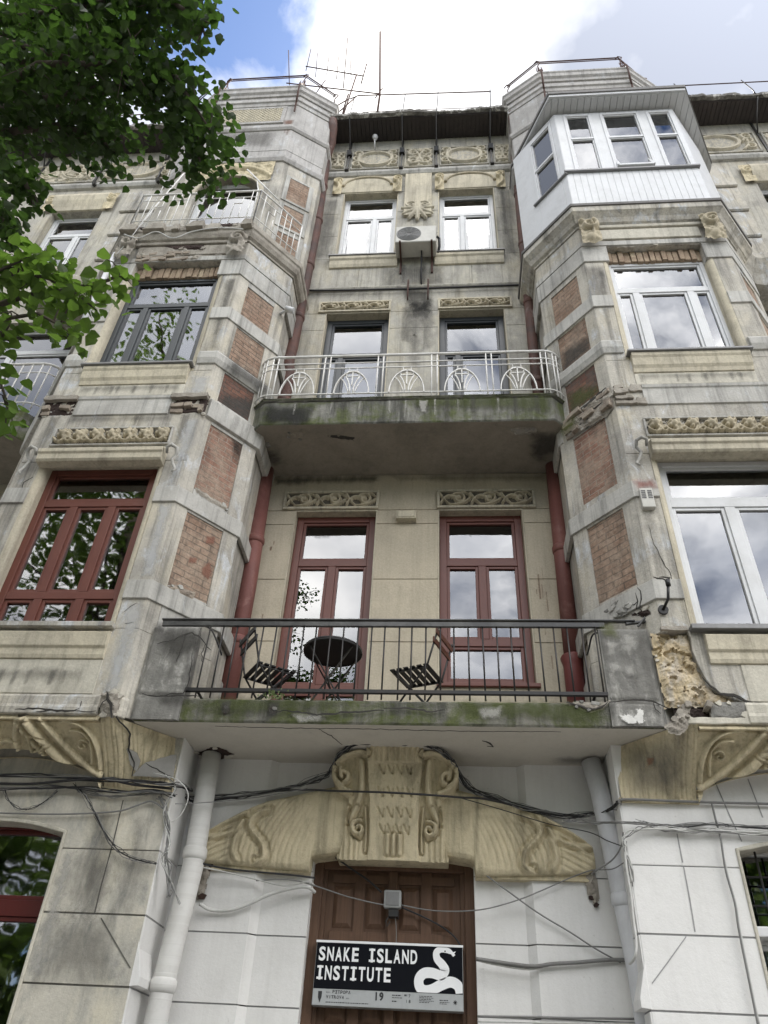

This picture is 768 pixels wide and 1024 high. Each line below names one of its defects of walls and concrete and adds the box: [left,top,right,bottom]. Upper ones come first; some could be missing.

leakage [408,290,430,316]
spalling [562,384,648,441]
spalling [650,625,749,722]
crack [19,691,170,776]
peeling [620,707,646,724]